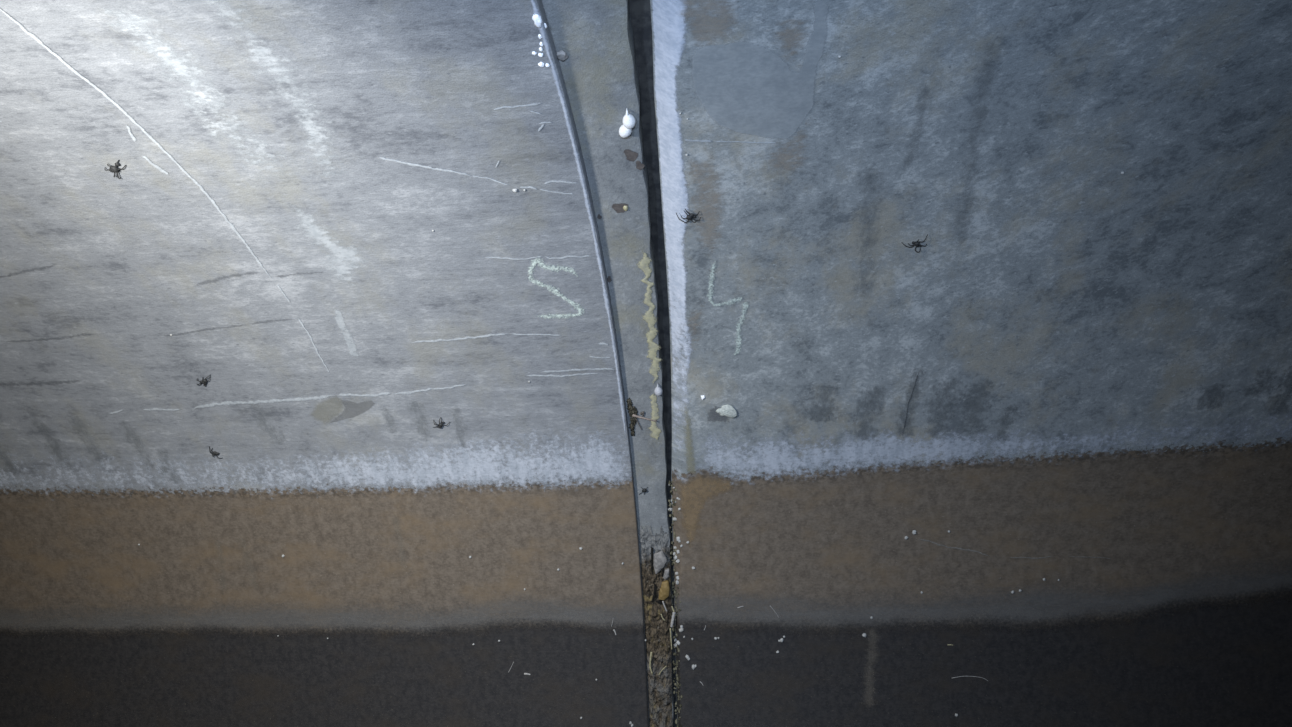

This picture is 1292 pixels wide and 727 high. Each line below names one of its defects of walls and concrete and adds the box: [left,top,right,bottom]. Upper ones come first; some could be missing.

damp [105,10,284,171]
damp [209,1,335,176]
damp [296,210,366,280]
damp [531,0,625,430]
damp [335,310,359,356]
damp [0,432,649,727]